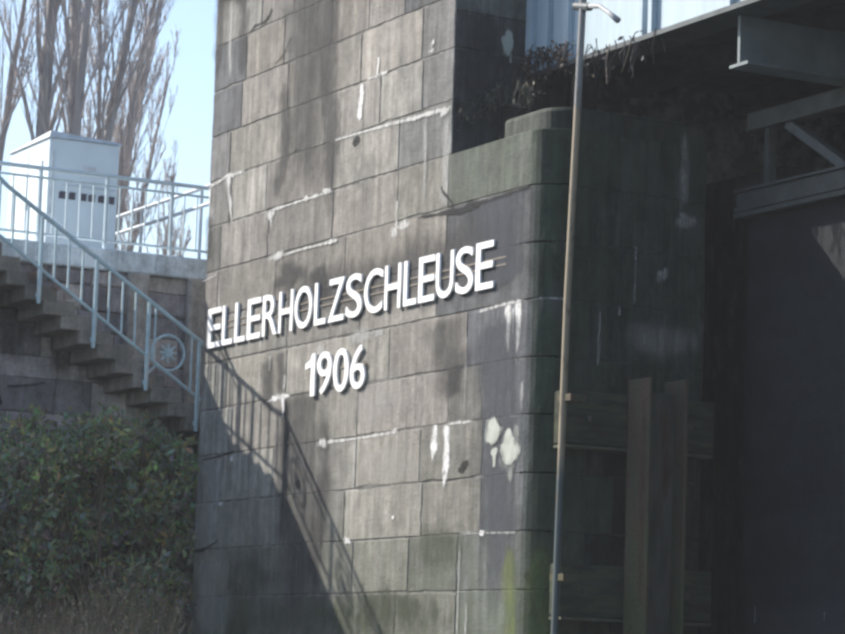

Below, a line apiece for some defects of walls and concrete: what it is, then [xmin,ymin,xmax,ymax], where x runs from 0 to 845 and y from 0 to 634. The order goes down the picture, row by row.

water stain [259,354,396,627]
water stain [476,300,521,634]